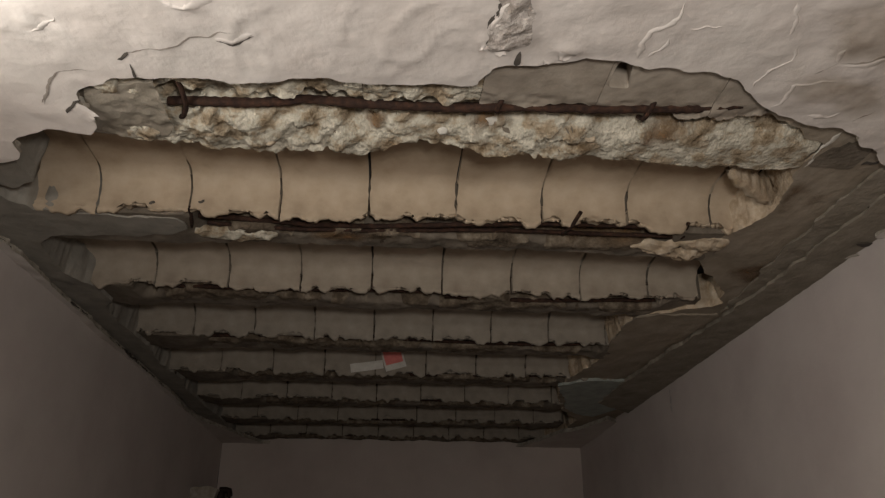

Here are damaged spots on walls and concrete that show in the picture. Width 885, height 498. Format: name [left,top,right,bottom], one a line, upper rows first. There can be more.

peeling [479,0,536,57]
peeling [65,100,99,122]
spalling [0,130,58,210]
spalling [76,80,885,413]
spalling [40,236,237,430]
spalling [205,325,599,442]